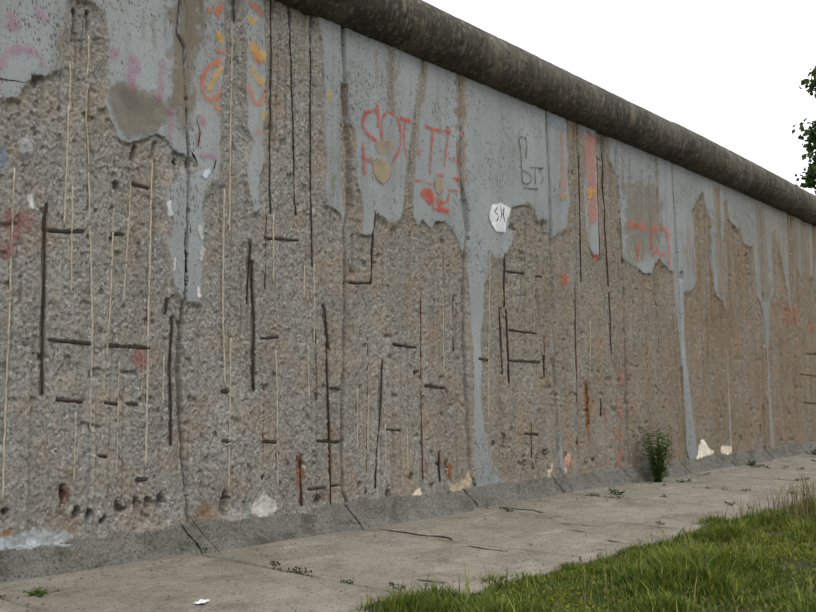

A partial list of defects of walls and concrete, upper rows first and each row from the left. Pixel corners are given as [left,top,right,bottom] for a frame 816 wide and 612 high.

spalling [0,0,476,551]
spalling [479,120,816,486]